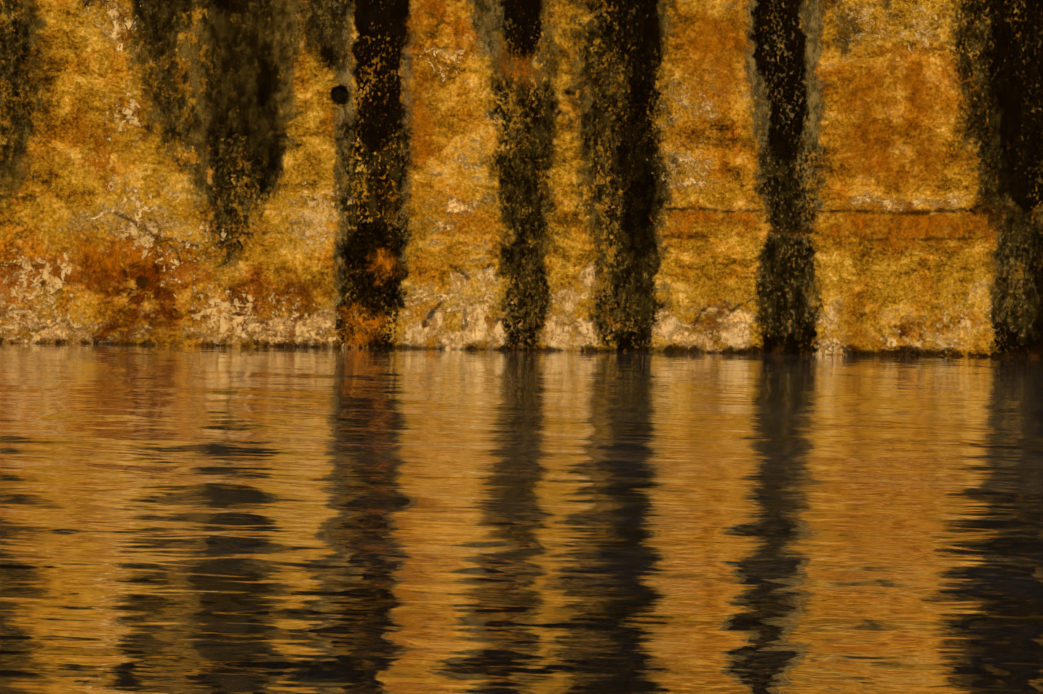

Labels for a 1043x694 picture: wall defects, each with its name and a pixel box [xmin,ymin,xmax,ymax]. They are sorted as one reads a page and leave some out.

leakage [0,0,47,189]
leakage [101,0,445,349]
leakage [467,0,1043,358]
leakage [0,239,156,345]
corrosion [44,230,192,344]